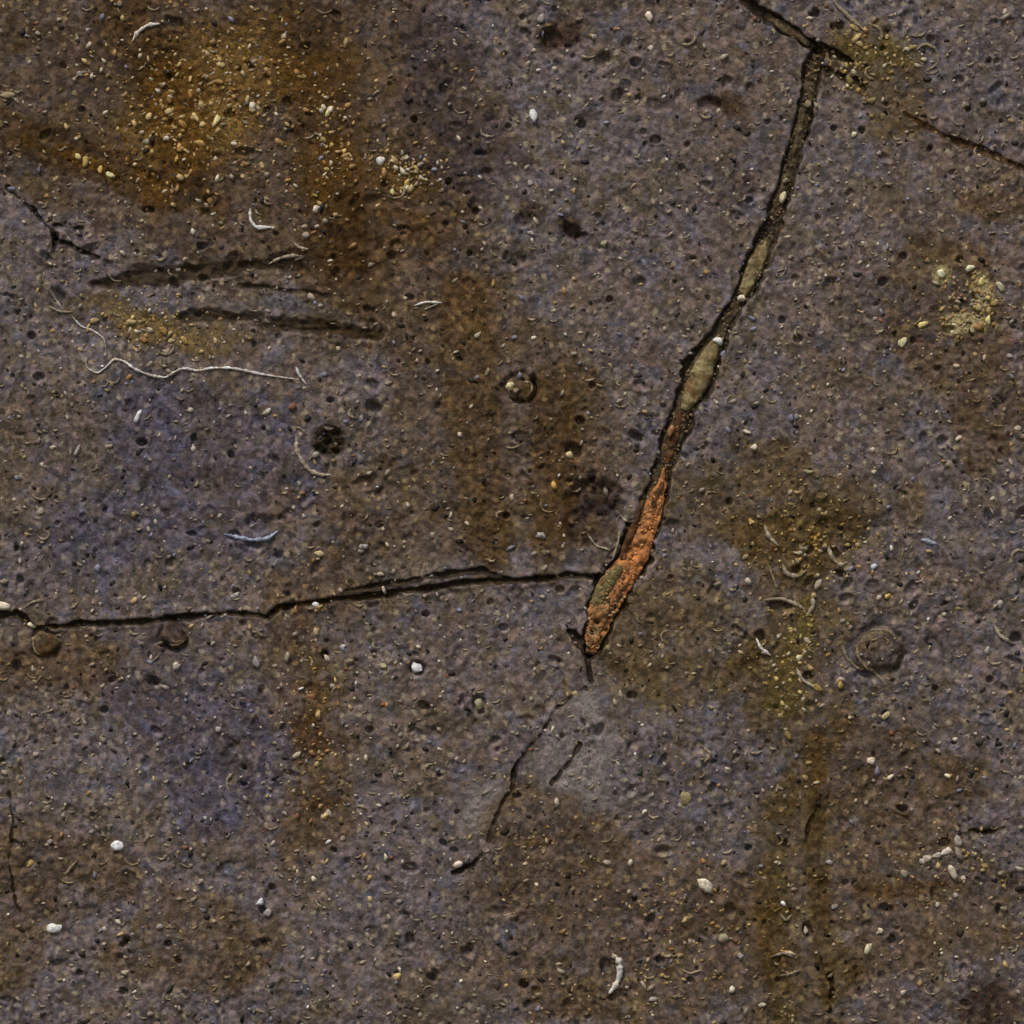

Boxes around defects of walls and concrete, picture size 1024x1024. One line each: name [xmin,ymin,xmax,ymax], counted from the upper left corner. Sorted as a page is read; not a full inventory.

water stain [219,99,333,226]
water stain [893,114,1021,233]
crack [902,111,1024,171]
water stain [19,183,173,335]
crack [0,0,867,875]
rust [585,468,666,653]
crack [6,790,21,911]